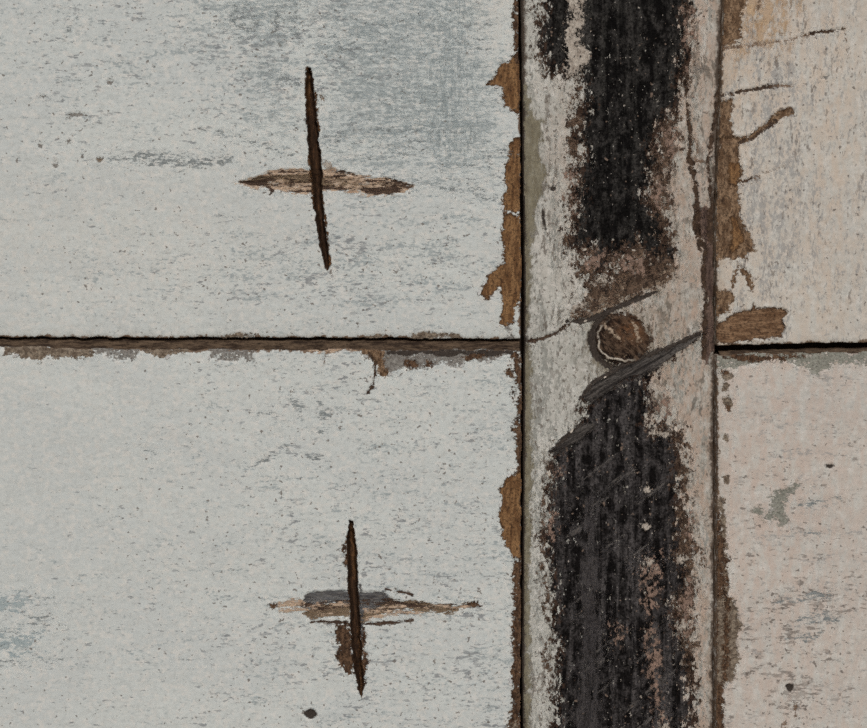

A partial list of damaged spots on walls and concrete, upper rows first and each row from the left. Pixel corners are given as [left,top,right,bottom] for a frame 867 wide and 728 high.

peeling [722,0,747,48]
crack [235,66,414,270]
peeling [486,0,705,326]
peeling [2,346,188,364]
peeling [207,349,254,362]
peeling [382,97,867,728]
crack [267,520,483,700]